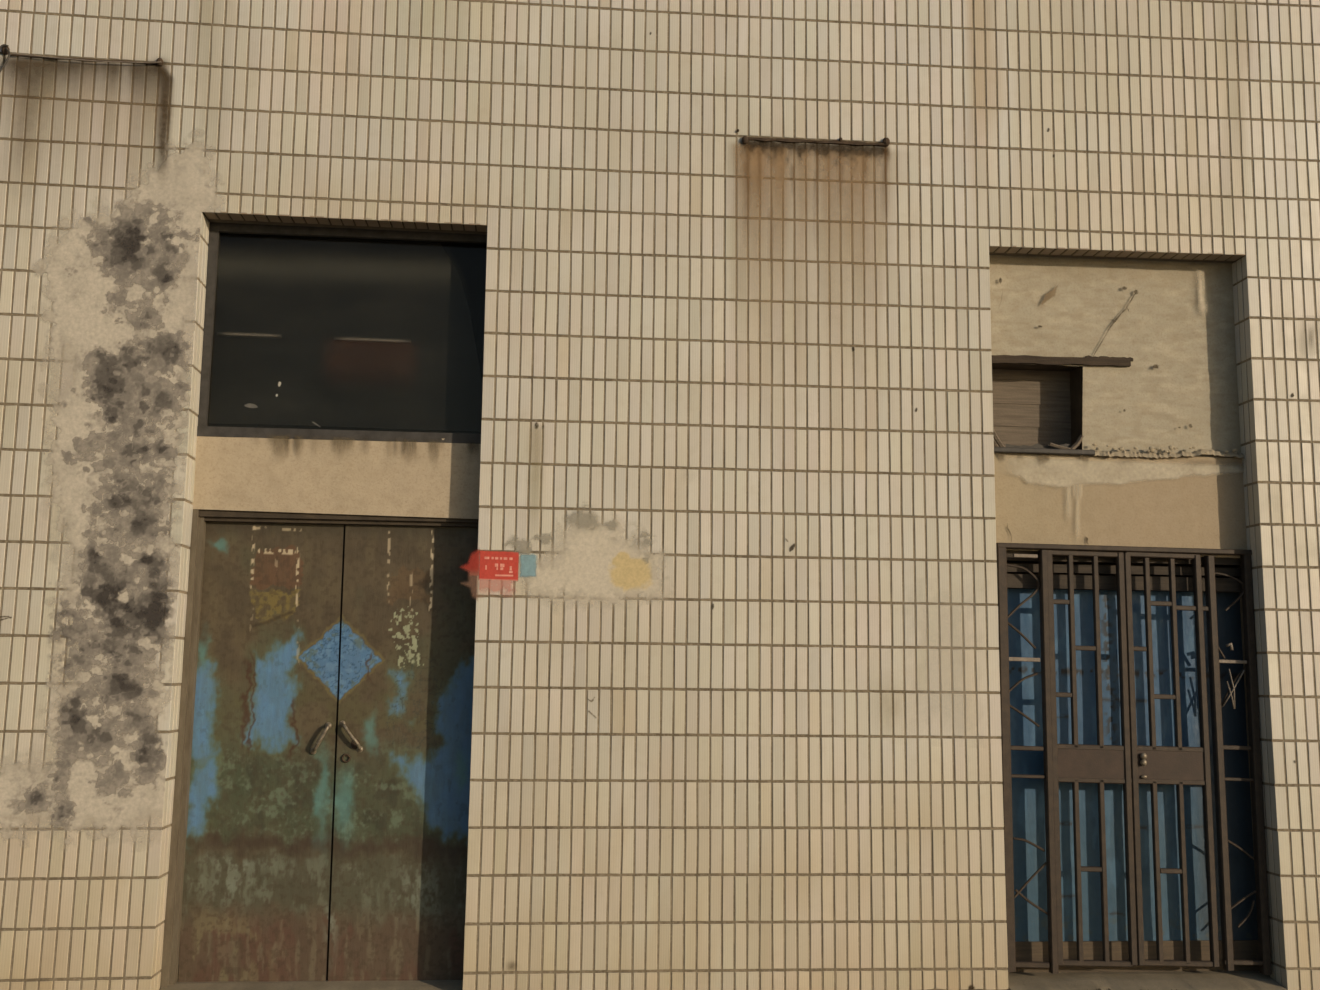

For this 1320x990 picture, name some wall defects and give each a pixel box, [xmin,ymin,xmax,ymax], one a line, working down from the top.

damp [0,58,223,844]
corrosion [737,140,888,221]